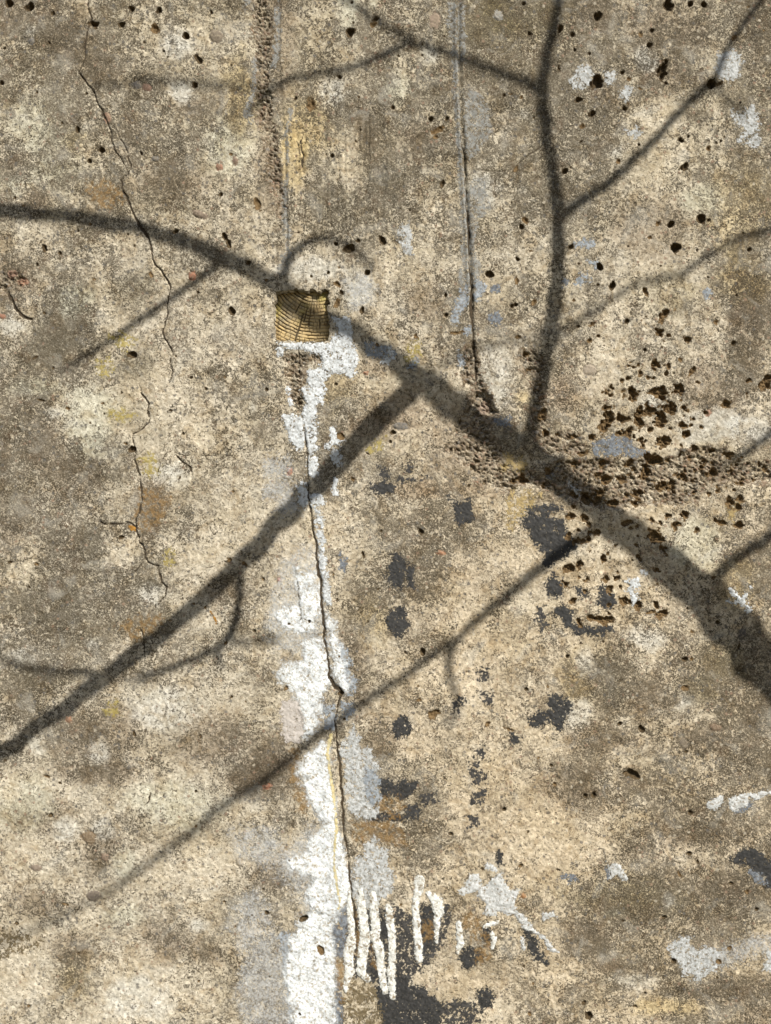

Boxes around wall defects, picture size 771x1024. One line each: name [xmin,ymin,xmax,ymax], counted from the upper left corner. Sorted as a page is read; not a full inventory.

crack [78,0,253,607]
crack [450,125,549,380]
crack [297,432,357,936]